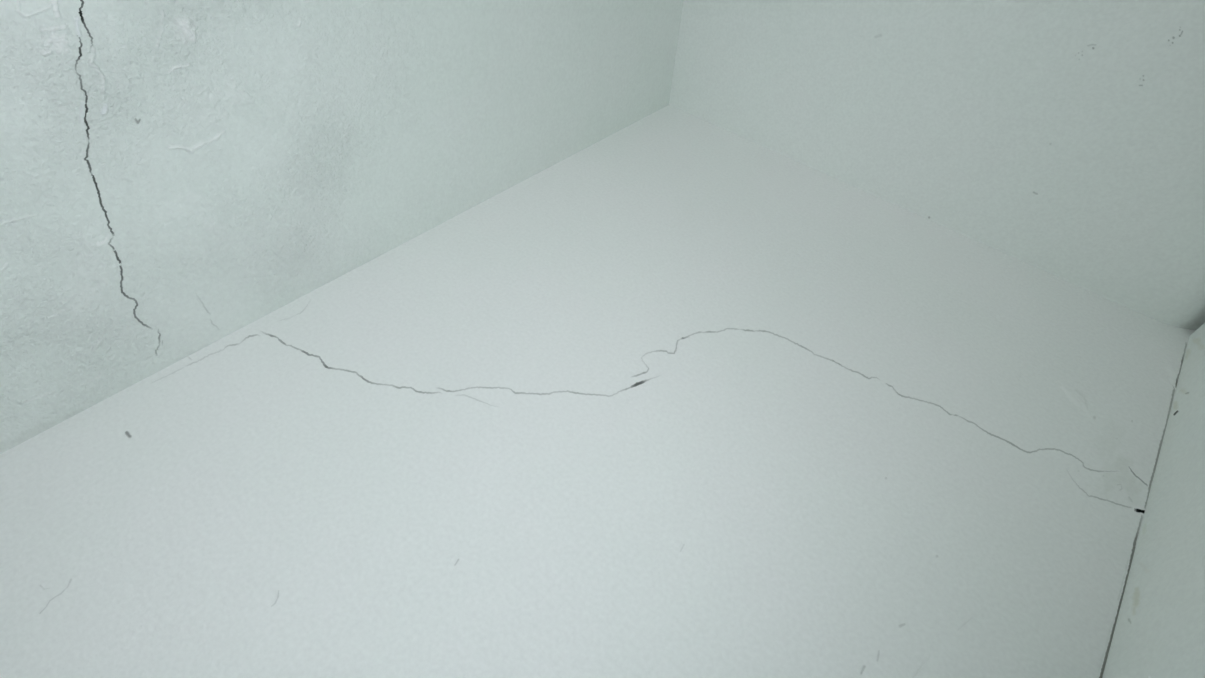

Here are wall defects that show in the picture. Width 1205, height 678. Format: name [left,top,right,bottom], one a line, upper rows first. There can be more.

crack [72,0,165,357]
crack [183,326,1188,678]